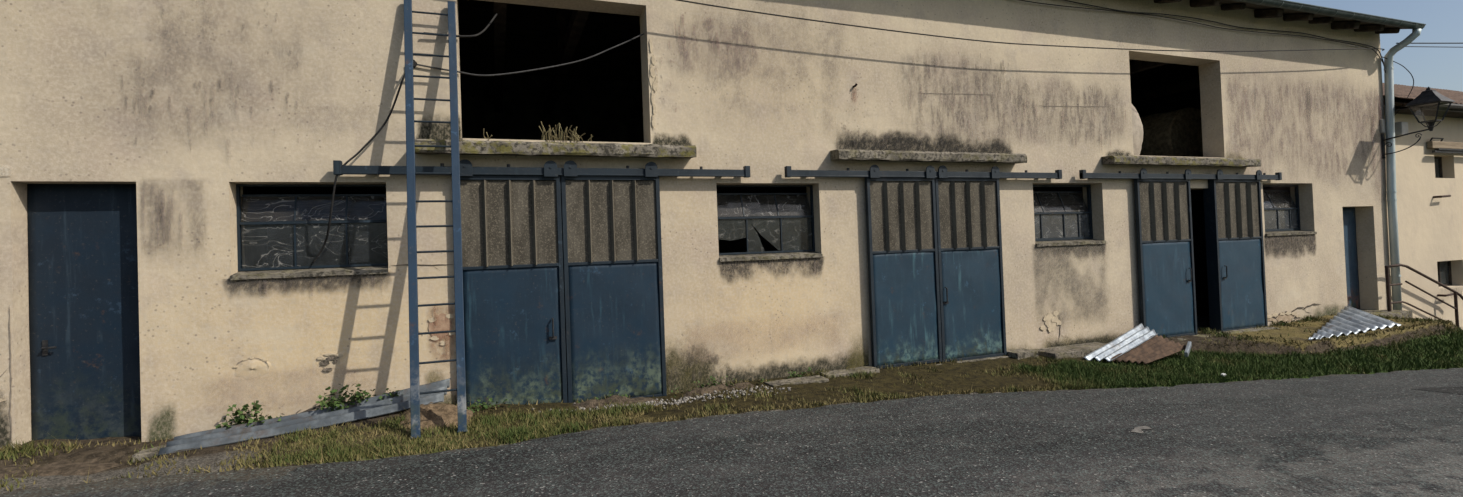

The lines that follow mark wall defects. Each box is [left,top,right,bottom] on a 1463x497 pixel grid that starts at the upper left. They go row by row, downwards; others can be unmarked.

water stain [839,73,1012,154]
water stain [1038,244,1105,256]
spalling [317,353,343,372]
water stain [666,348,869,394]
water stain [0,412,11,449]